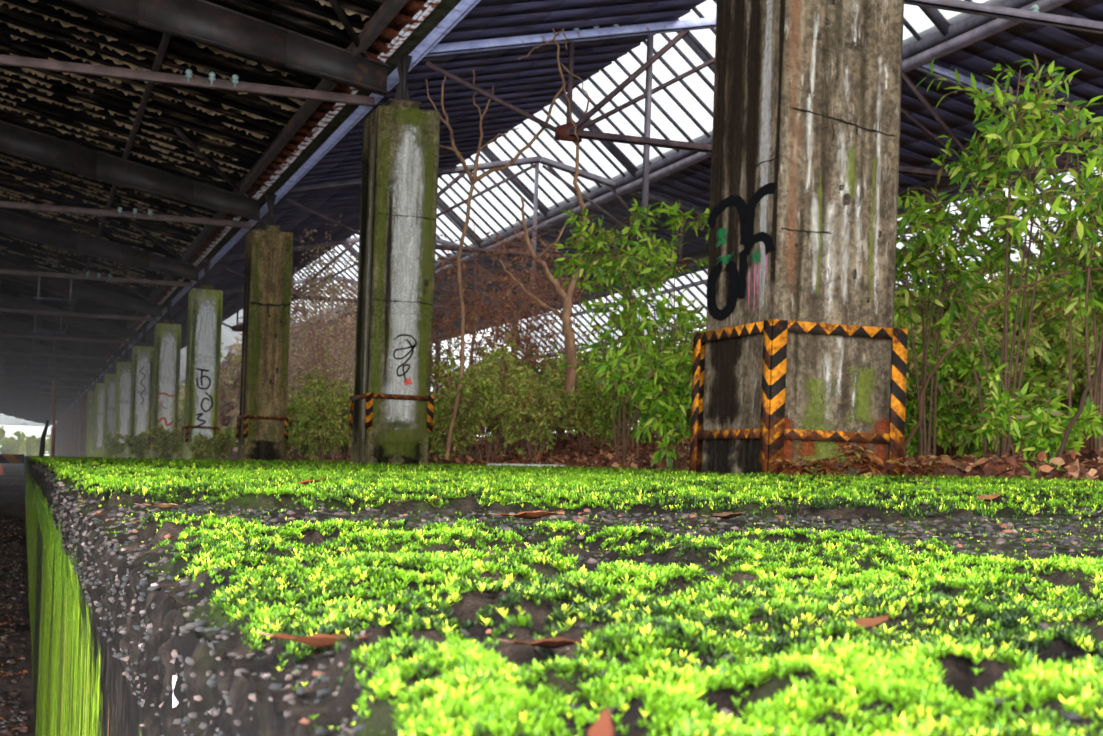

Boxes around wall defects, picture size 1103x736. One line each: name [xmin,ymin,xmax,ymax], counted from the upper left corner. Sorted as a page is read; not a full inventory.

water stain [238,249,279,461]
water stain [353,143,377,447]
water stain [384,195,393,394]
water stain [374,441,422,465]
water stain [701,336,760,476]
water stain [707,0,785,312]
rust [783,418,815,474]
water stain [795,2,848,396]
water stain [841,126,880,298]